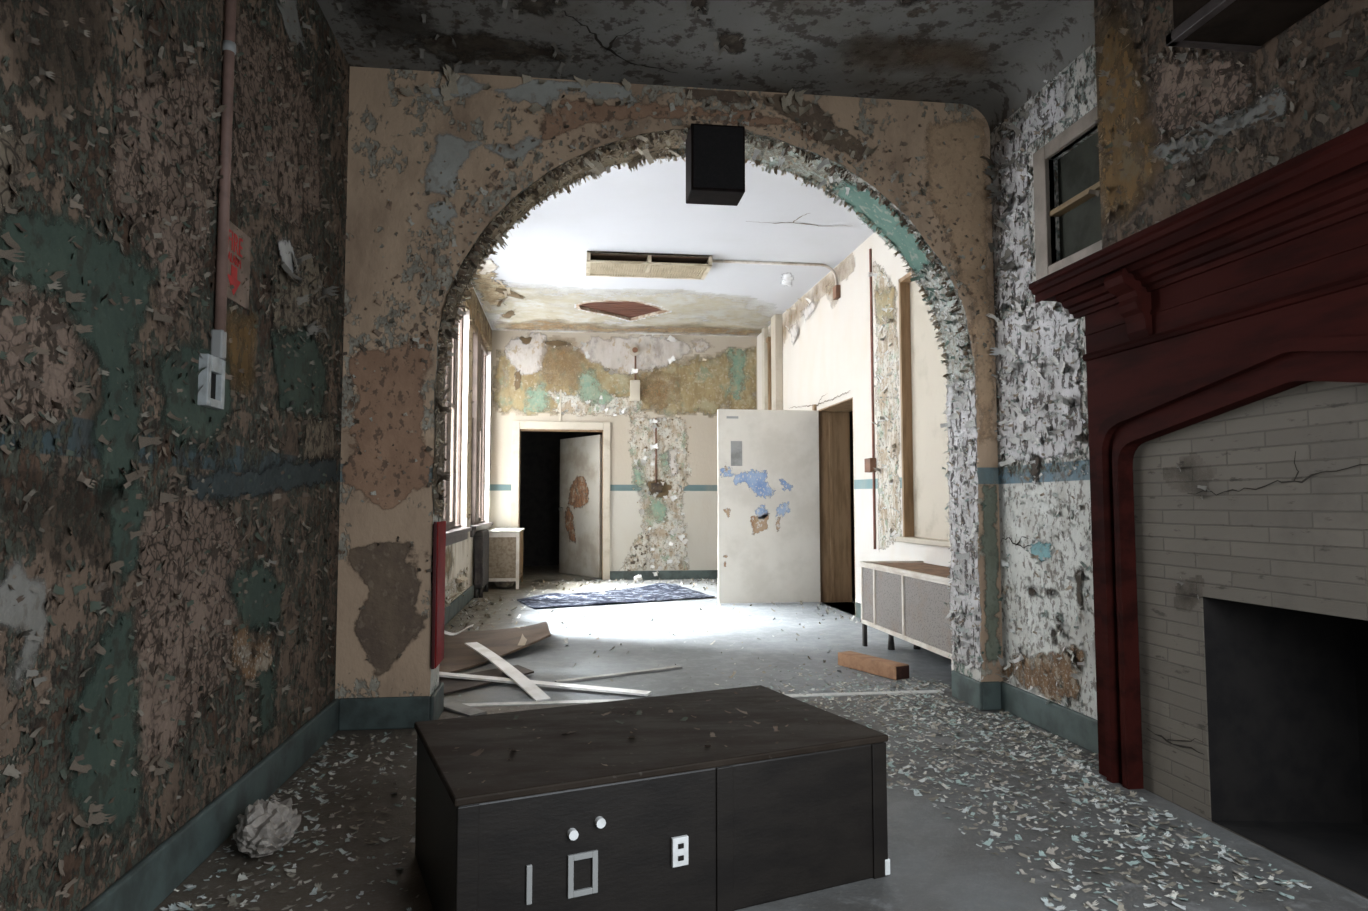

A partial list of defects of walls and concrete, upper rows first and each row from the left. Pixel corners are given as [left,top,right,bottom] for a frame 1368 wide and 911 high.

flaking render [1092,1,1368,243]
water stain [463,257,847,418]
crack [1187,451,1368,495]